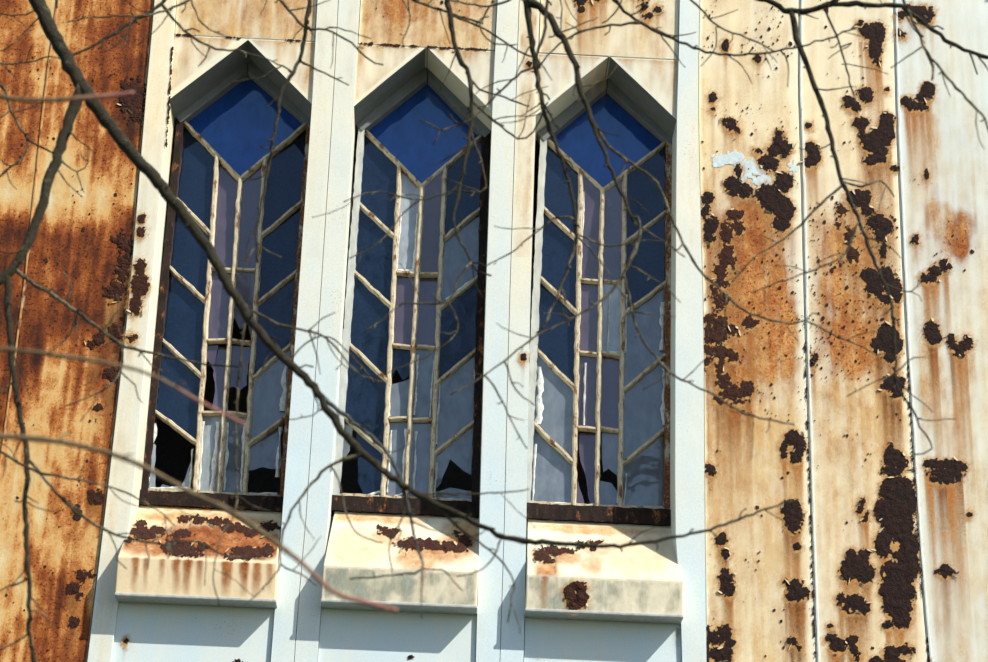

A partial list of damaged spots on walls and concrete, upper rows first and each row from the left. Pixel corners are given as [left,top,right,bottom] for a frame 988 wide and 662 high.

rust [357,0,494,66]
rust [573,0,606,44]
rust [638,0,664,22]
rust [719,39,730,53]
rust [708,92,742,134]
peeling [711,149,773,188]
rust [0,0,153,662]
rust [809,2,978,662]
rust [700,121,823,662]
rust [124,507,278,585]
rust [400,521,477,567]
rust [562,580,590,610]